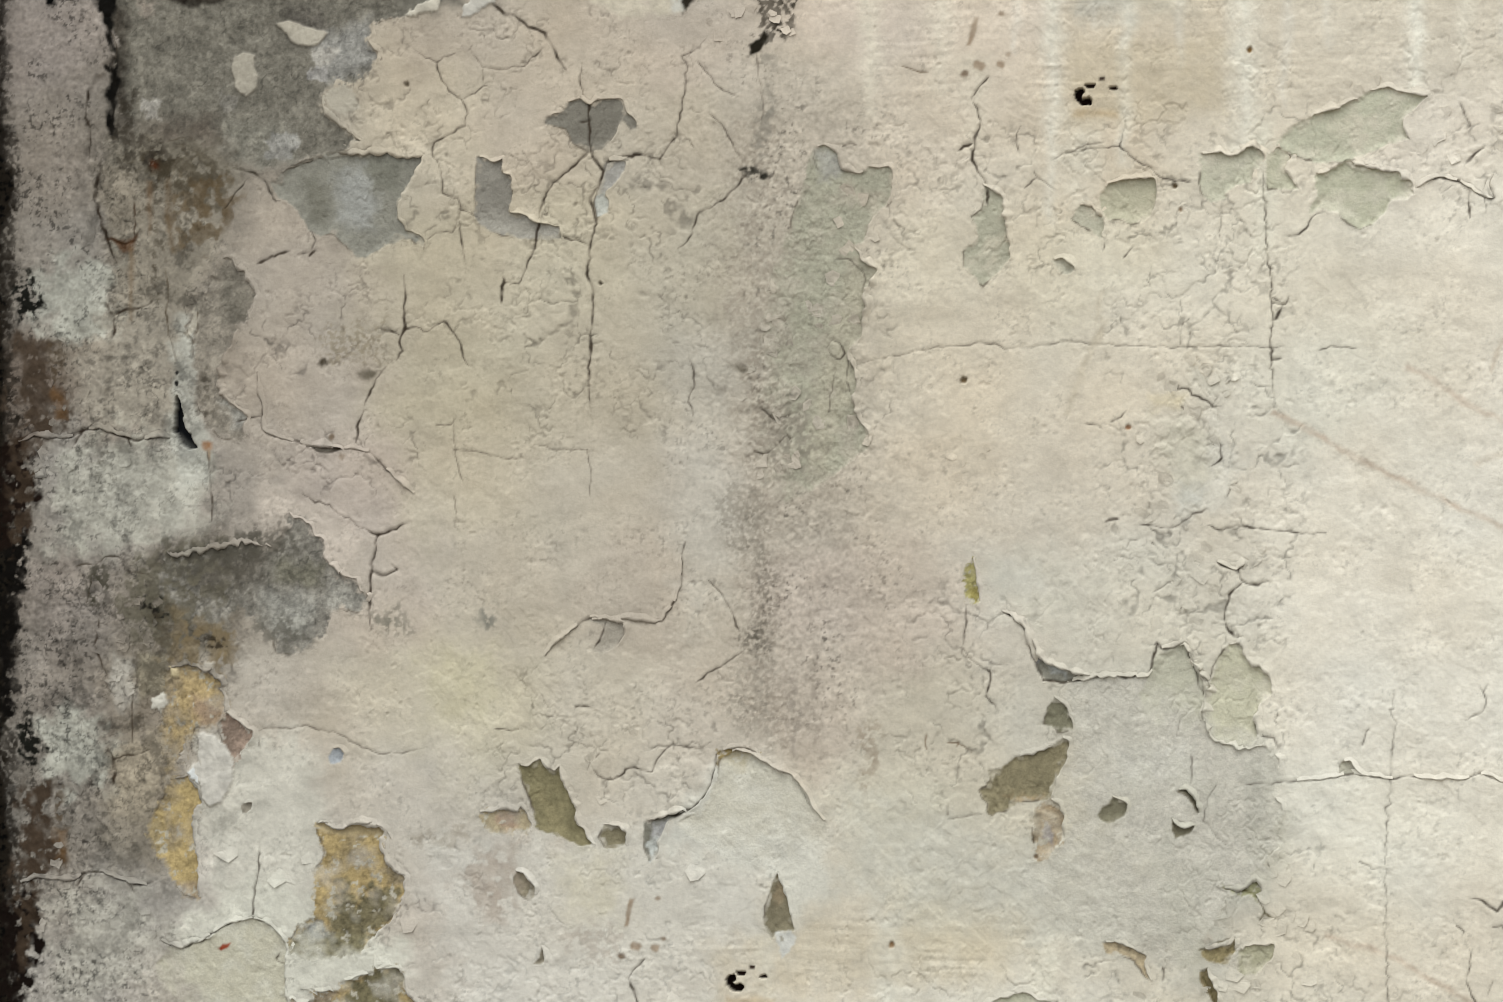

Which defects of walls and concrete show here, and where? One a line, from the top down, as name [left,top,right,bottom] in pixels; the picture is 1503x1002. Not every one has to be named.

leakage [9,264,50,325]
crack [83,28,200,362]
leakage [101,82,251,314]
flaking render [105,0,427,259]
crack [206,4,766,633]
crack [753,171,1358,456]
leakage [8,709,52,770]
peeling [92,815,420,1002]
leakage [78,502,596,833]
peeling [473,743,829,940]
peeling [976,607,1317,1002]
crack [960,386,1503,1002]